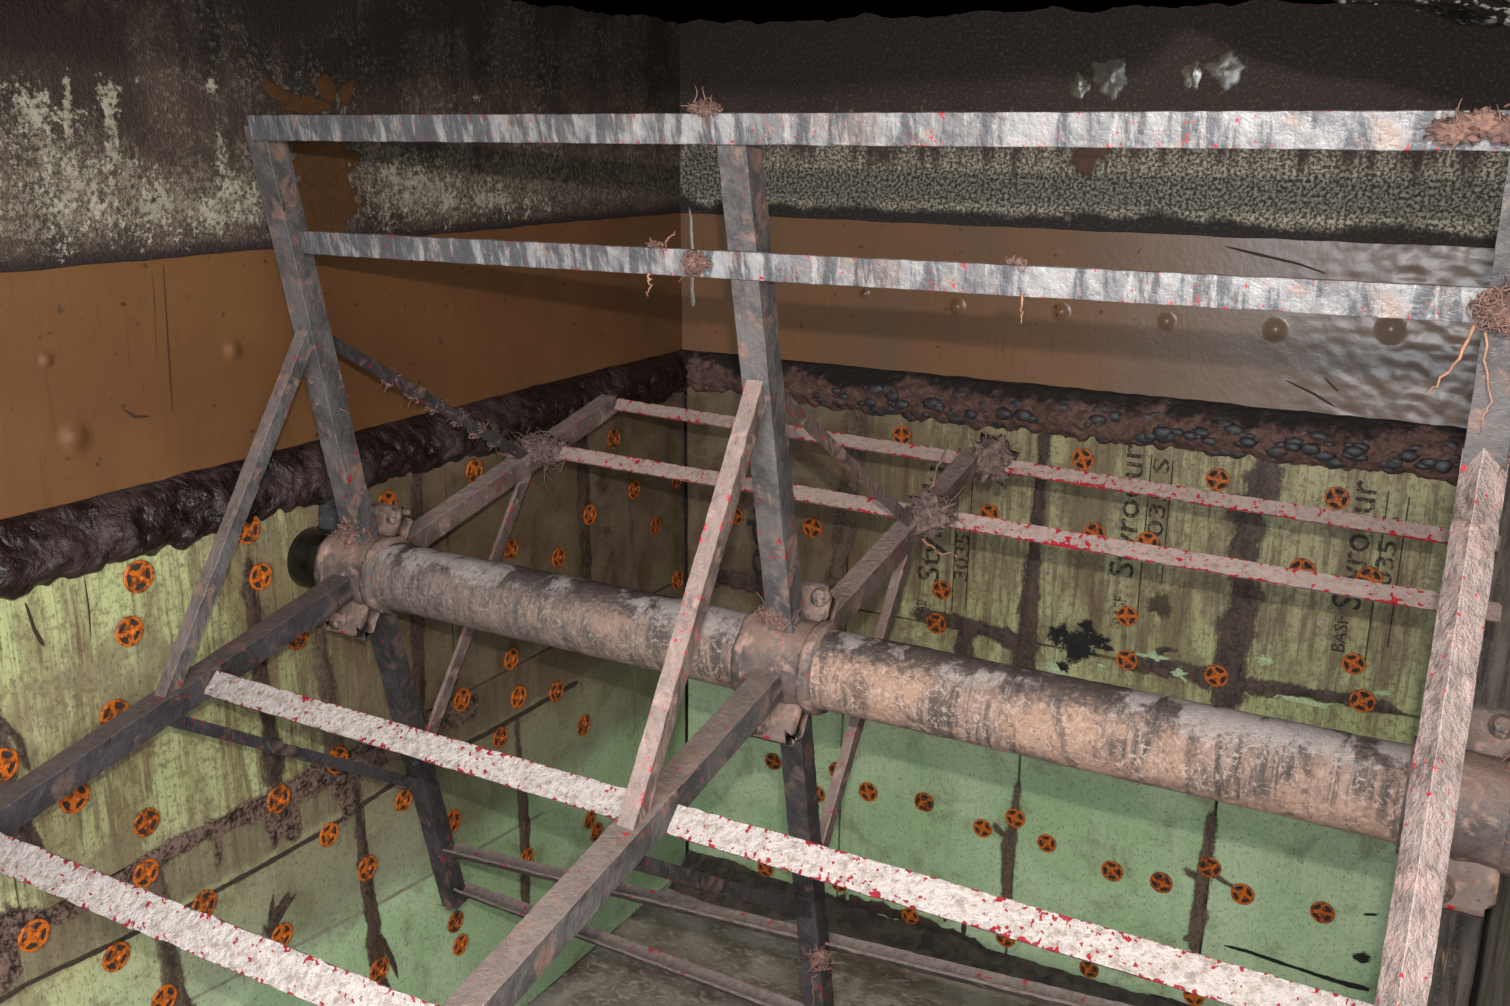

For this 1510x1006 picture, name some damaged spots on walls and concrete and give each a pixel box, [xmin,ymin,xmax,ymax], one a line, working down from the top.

leakage [0,68,265,263]
peeling [1043,659,1068,675]
peeling [1134,650,1188,683]
peeling [1256,655,1275,667]
peeling [1270,693,1338,711]